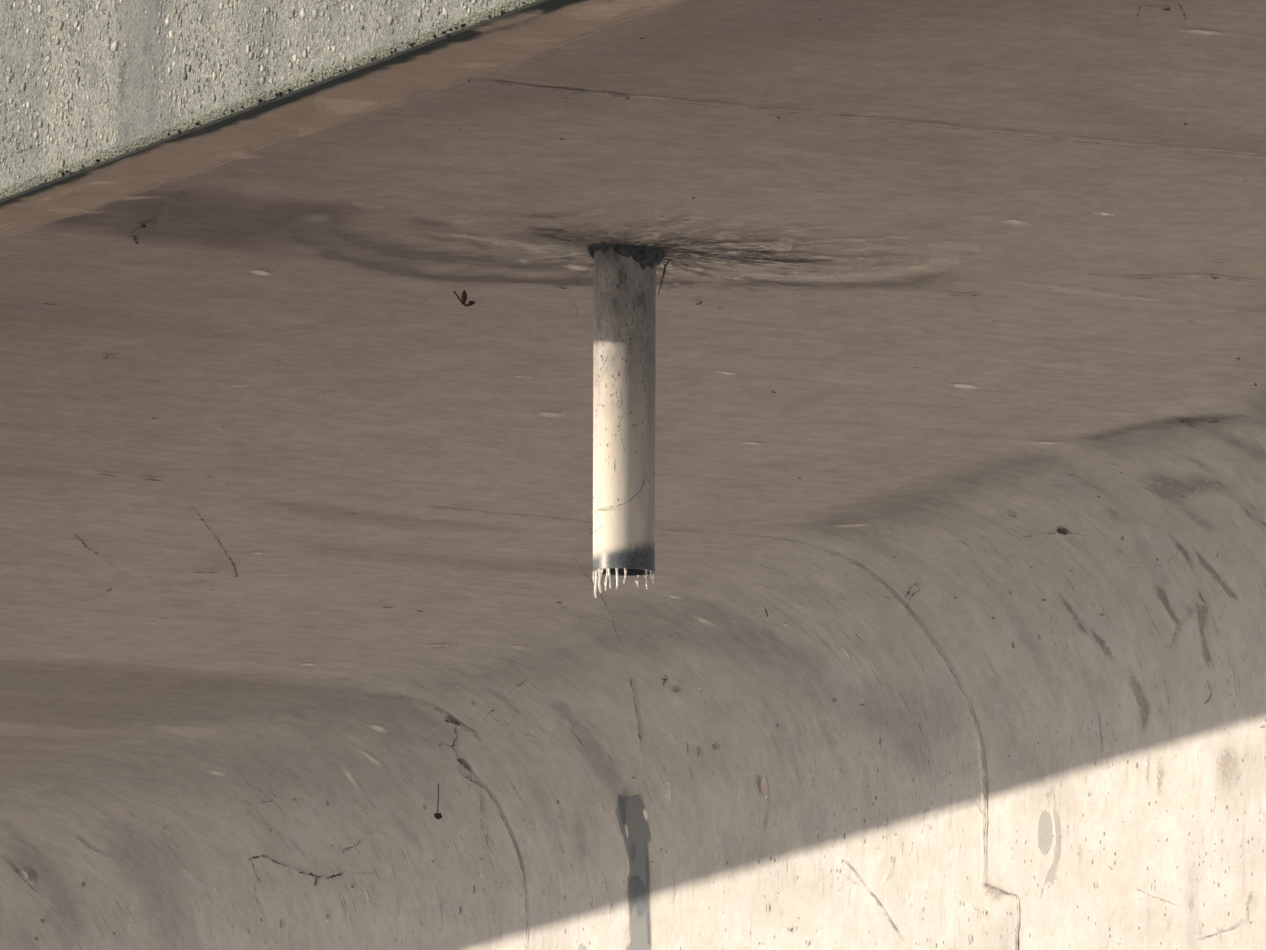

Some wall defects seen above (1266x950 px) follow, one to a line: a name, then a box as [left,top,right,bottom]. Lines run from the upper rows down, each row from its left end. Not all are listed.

water stain [290,225,941,288]
water stain [616,794,651,950]